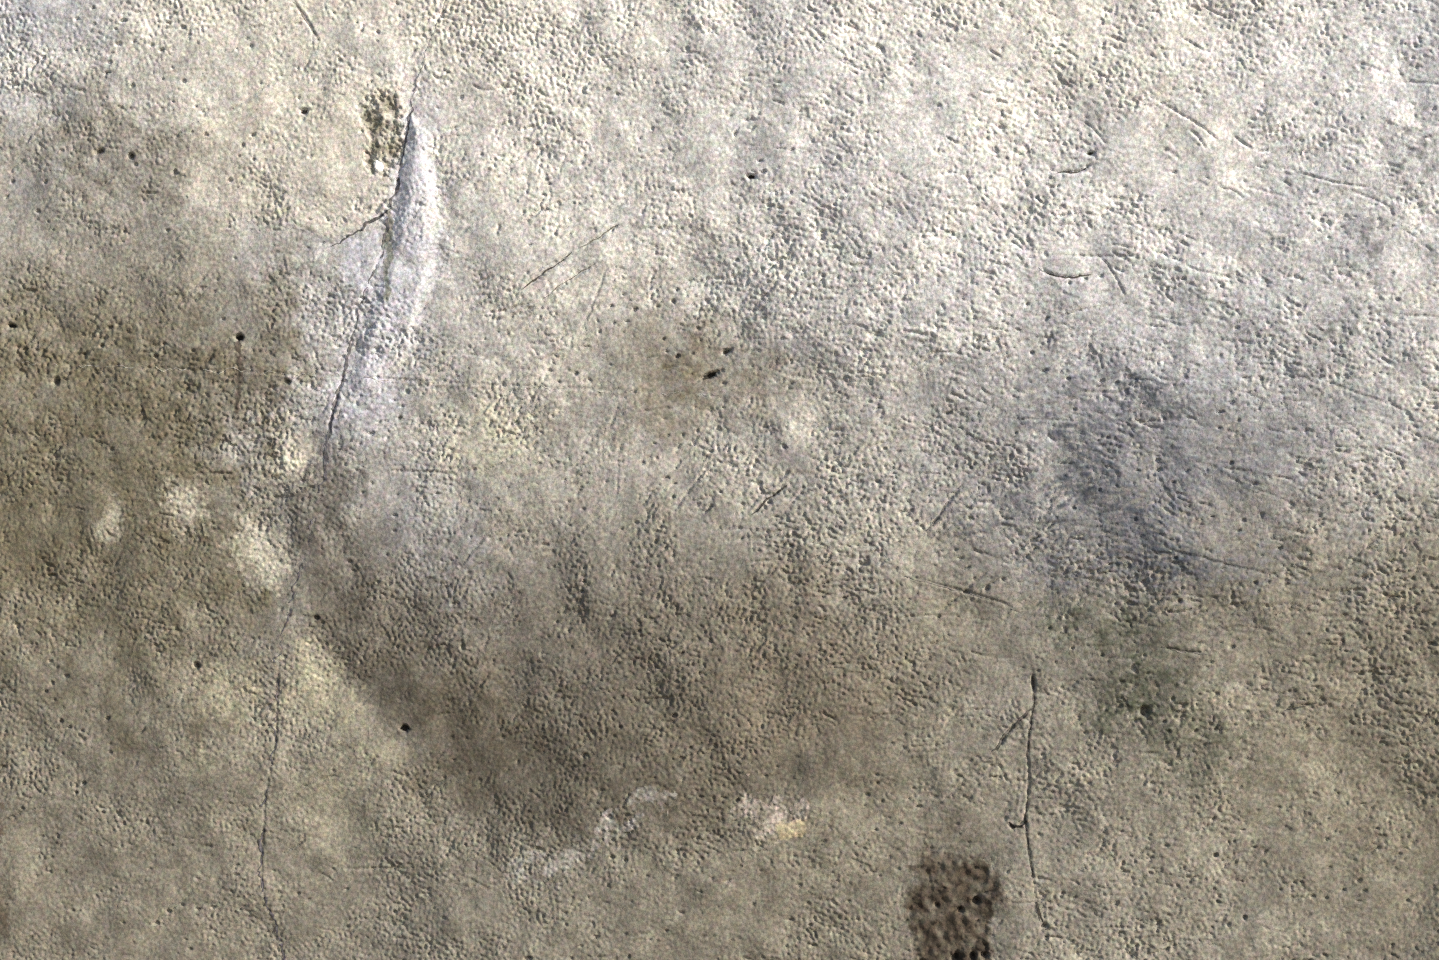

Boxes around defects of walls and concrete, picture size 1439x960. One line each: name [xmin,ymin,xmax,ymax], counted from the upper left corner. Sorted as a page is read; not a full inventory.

leakage [383,47,452,148]
leakage [1261,112,1302,164]
leakage [1331,98,1439,273]
leakage [580,362,602,387]
leakage [595,264,857,464]
leakage [1238,295,1371,430]
crack [258,0,447,960]
leakage [0,874,19,952]